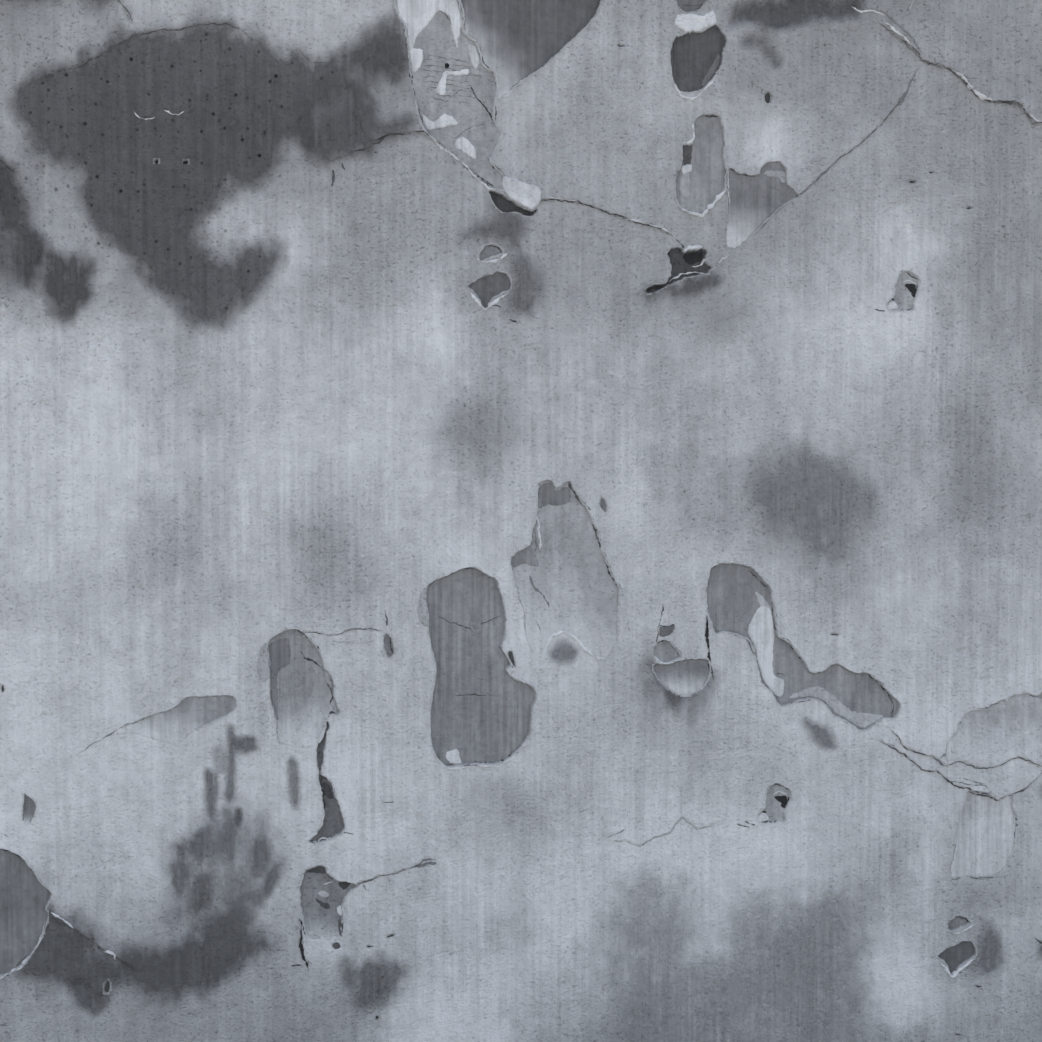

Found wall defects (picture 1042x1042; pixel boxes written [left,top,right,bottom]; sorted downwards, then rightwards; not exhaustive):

leakage [0,160,92,319]
leakage [16,22,412,323]
flaking render [394,0,603,218]
flaking render [669,0,729,100]
flaking render [645,112,800,295]
crack [800,0,1042,194]
flaking render [0,847,53,979]
leakage [22,728,277,999]
leakage [289,760,298,804]
flaking render [258,628,352,845]
flaking render [418,478,621,770]
flaking render [651,562,902,731]